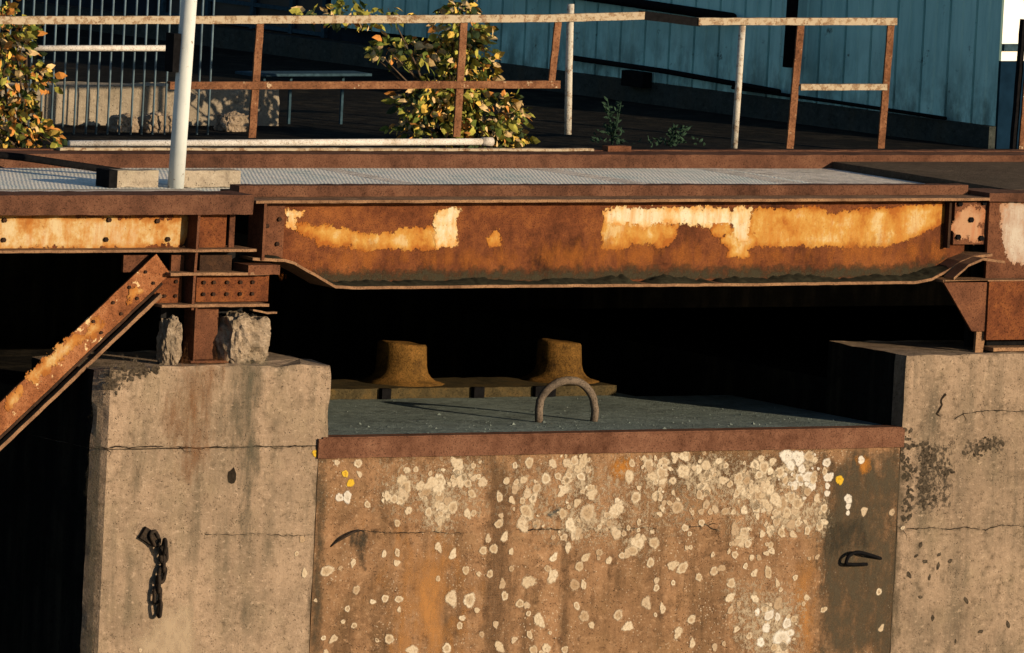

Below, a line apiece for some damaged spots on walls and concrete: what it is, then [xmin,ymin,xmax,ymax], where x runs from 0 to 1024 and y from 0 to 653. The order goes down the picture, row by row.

peeling [285,207,461,253]
peeling [600,202,1024,267]
crack [936,393,1020,419]
crack [95,445,316,456]
crack [891,525,1024,536]